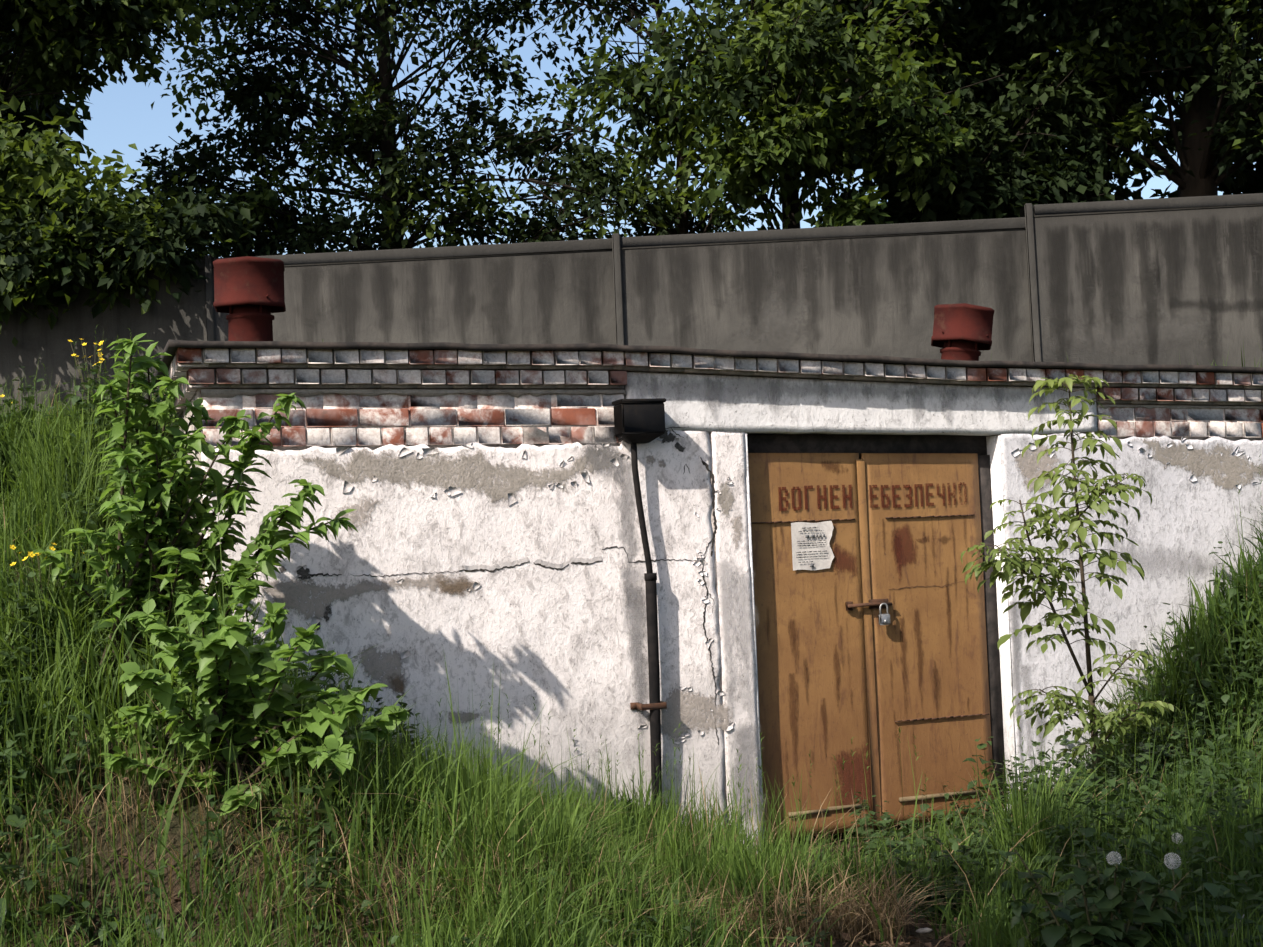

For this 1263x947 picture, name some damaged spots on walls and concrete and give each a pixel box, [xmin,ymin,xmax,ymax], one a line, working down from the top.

peeling [302,442,628,535]
flaking render [656,428,685,452]
peeling [1127,437,1263,490]
corrosion [893,527,916,580]
peeling [257,565,480,630]
crack [310,427,719,745]
peeling [347,645,411,696]
peeling [448,712,479,724]
peeling [637,687,734,744]
corrosion [837,748,871,806]